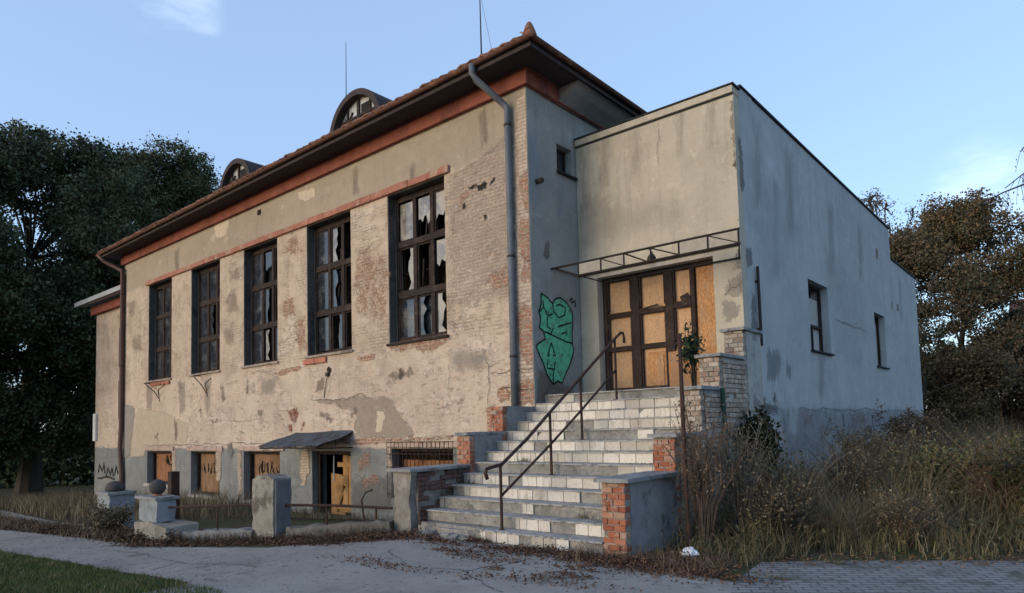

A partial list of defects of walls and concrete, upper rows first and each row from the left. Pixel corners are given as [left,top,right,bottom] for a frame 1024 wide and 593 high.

peeling [297,187,315,202]
peeling [214,219,229,238]
flaking render [448,92,534,432]
peeling [722,253,742,322]
flaking render [283,298,308,350]
spalling [315,367,453,469]
flaking render [215,444,242,498]
flaking render [300,449,310,486]